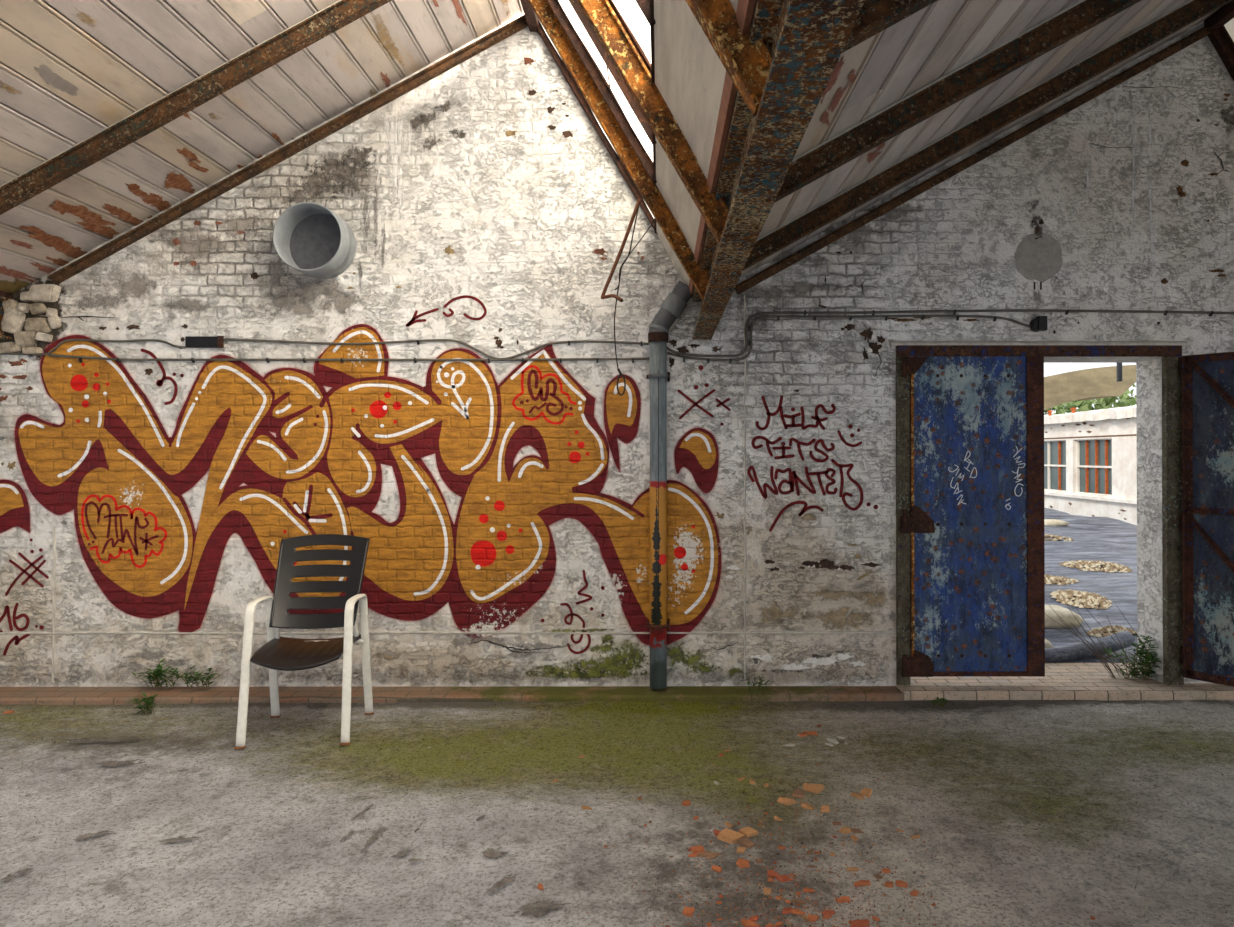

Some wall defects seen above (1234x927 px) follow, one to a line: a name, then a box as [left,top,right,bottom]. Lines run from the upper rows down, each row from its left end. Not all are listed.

peeling [49,148,210,239]
damp [283,101,465,266]
spalling [0,226,88,402]
peeling [796,544,882,580]